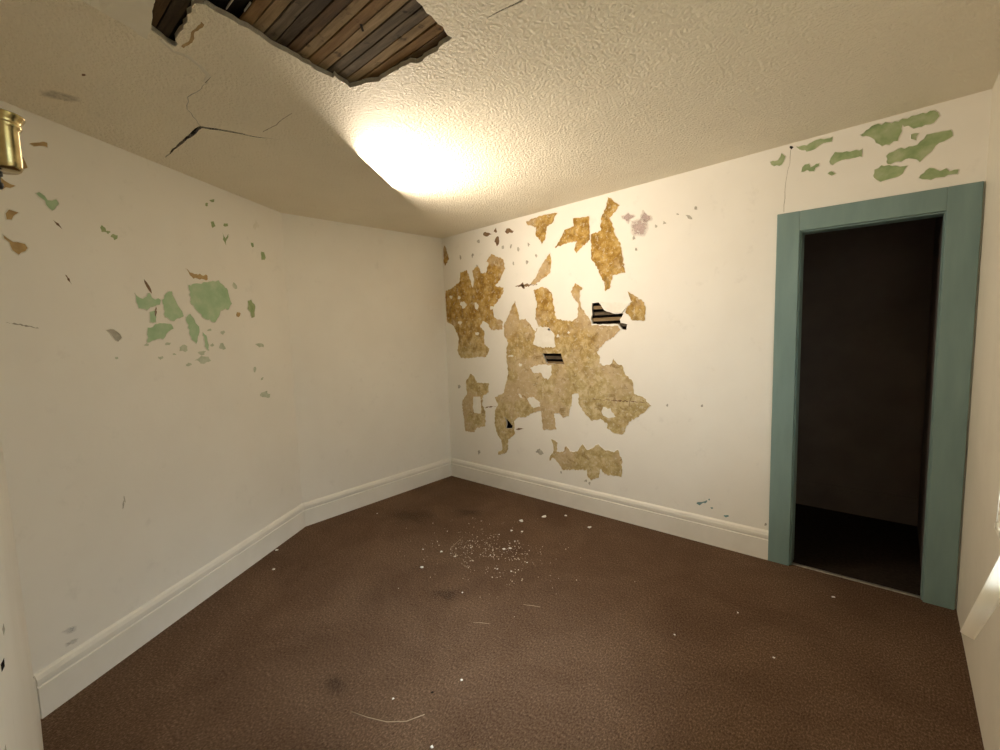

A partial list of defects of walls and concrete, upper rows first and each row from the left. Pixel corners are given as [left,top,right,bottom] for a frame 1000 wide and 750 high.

spalling [151,0,450,87]
peeling [770,109,960,183]
peeling [134,269,256,366]
peeling [443,197,651,485]